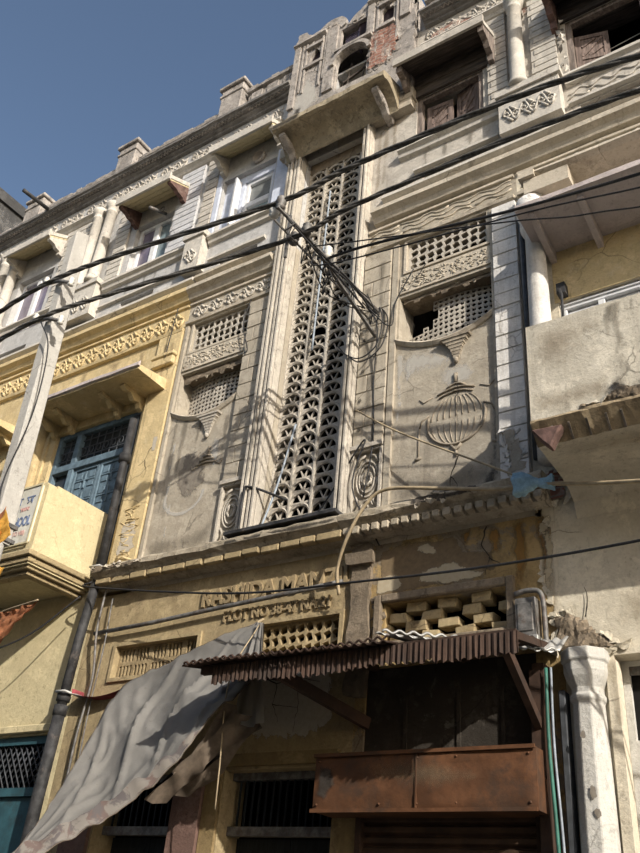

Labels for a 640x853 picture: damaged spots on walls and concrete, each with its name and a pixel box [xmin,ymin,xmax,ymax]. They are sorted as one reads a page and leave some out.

flaking render [366,20,403,73]
flaking render [579,381,640,408]
peeling [370,537,495,635]
flaking render [533,469,633,658]
peeling [253,679,332,740]